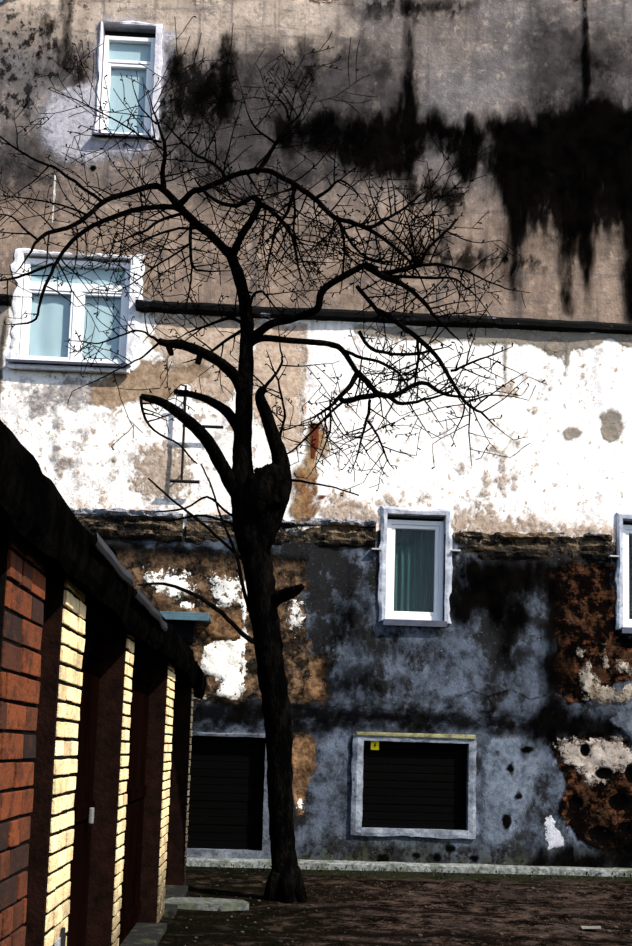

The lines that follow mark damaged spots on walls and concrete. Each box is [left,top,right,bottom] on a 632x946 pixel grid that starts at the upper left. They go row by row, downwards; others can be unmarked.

damp [0,0,86,123]
damp [160,34,240,133]
damp [274,7,632,382]
peeling [24,314,240,432]
peeling [253,320,309,452]
spalling [110,542,262,705]
damp [192,695,264,732]
spalling [270,552,329,705]
damp [289,558,620,753]
spalling [550,561,632,706]
damp [349,836,632,868]
spalling [544,734,632,851]